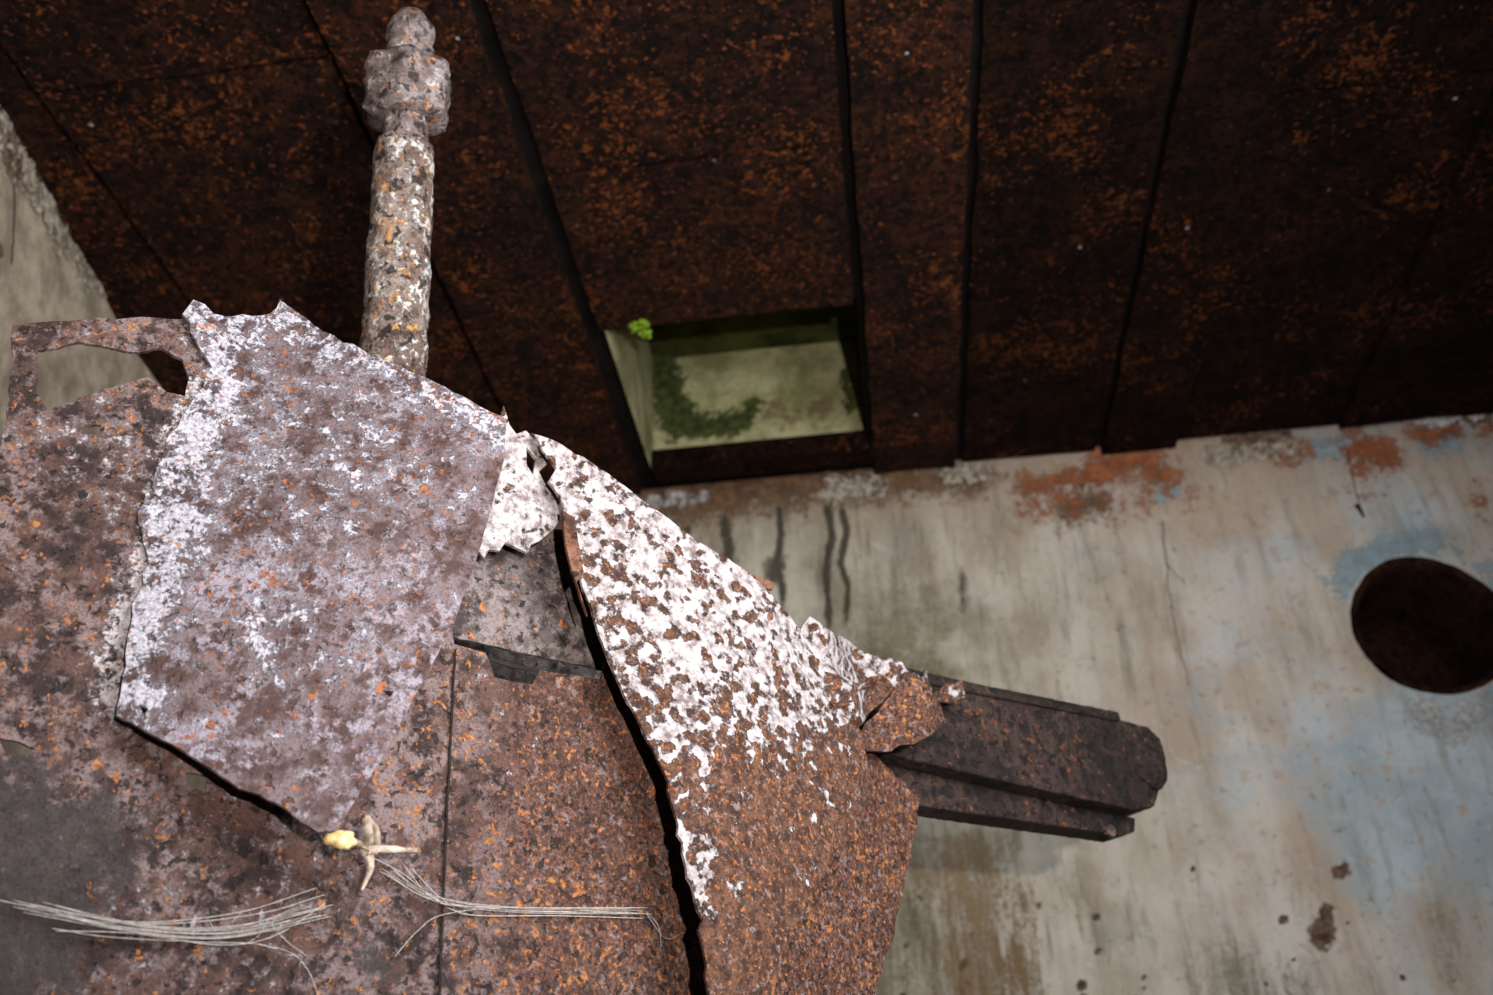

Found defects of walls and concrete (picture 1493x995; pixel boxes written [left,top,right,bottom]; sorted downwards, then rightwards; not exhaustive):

rust [1010,447,1213,534]
rust [1320,425,1403,501]
leakage [639,460,1007,628]